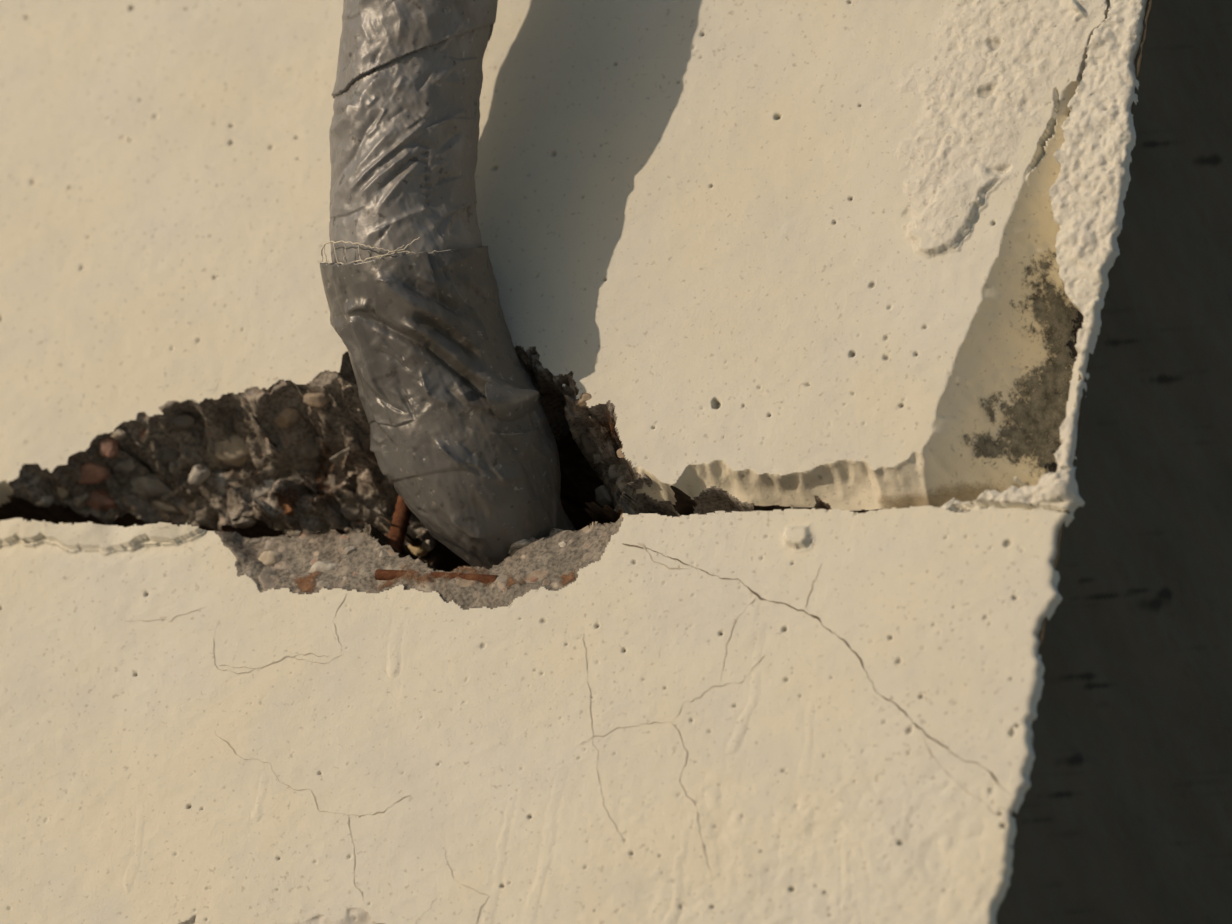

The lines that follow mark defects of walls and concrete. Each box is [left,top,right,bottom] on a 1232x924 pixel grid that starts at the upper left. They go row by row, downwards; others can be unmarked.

damp [964,250,1084,476]
rust [375,495,524,590]
spalling [0,345,923,610]
rust [560,572,576,586]
crack [582,543,1010,874]